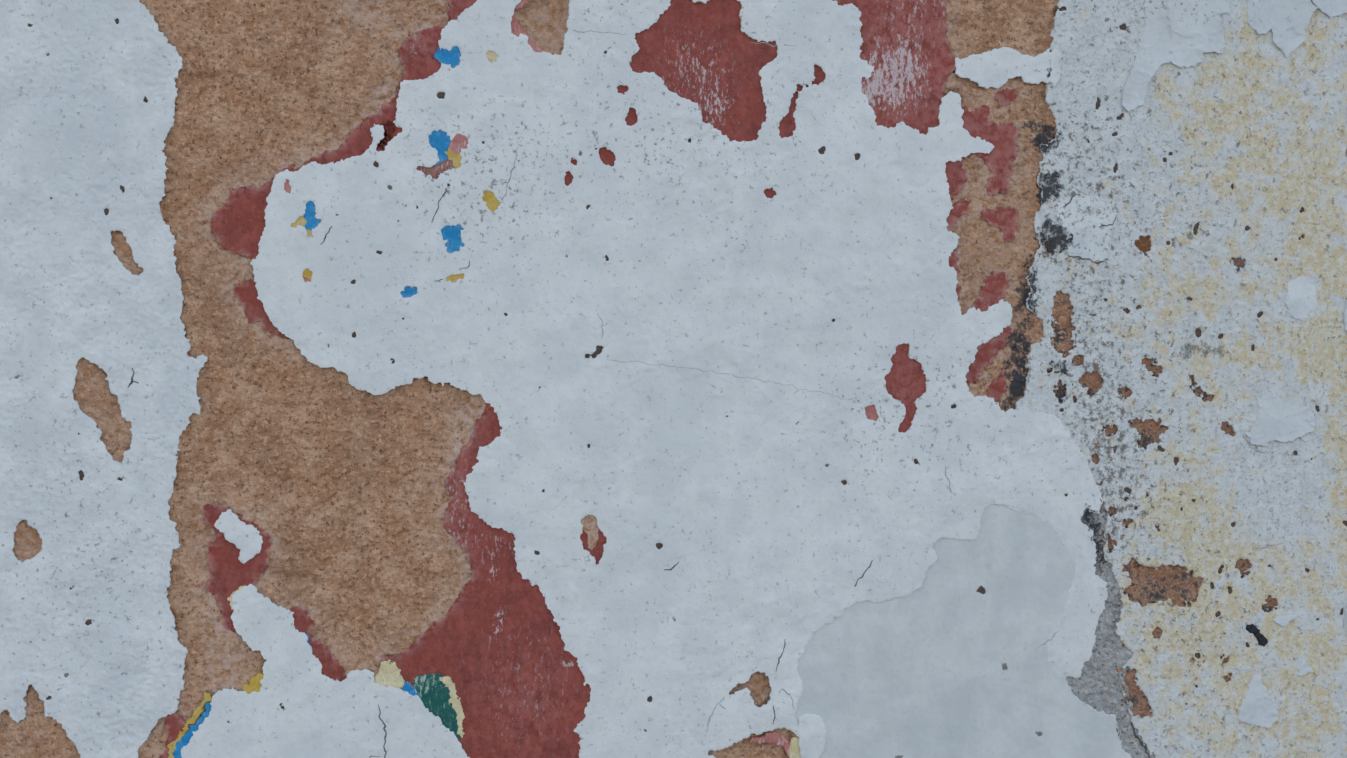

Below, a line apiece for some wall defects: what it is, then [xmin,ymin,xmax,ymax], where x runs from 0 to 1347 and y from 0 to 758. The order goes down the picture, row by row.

peeling [617,0,825,142]
peeling [564,145,616,186]
peeling [111,231,143,275]
peeling [138,0,591,758]
peeling [832,0,1347,758]
peeling [72,358,132,481]
peeling [580,515,607,564]
peeling [0,684,80,758]
flaking render [729,671,771,707]
flaking render [708,713,827,758]